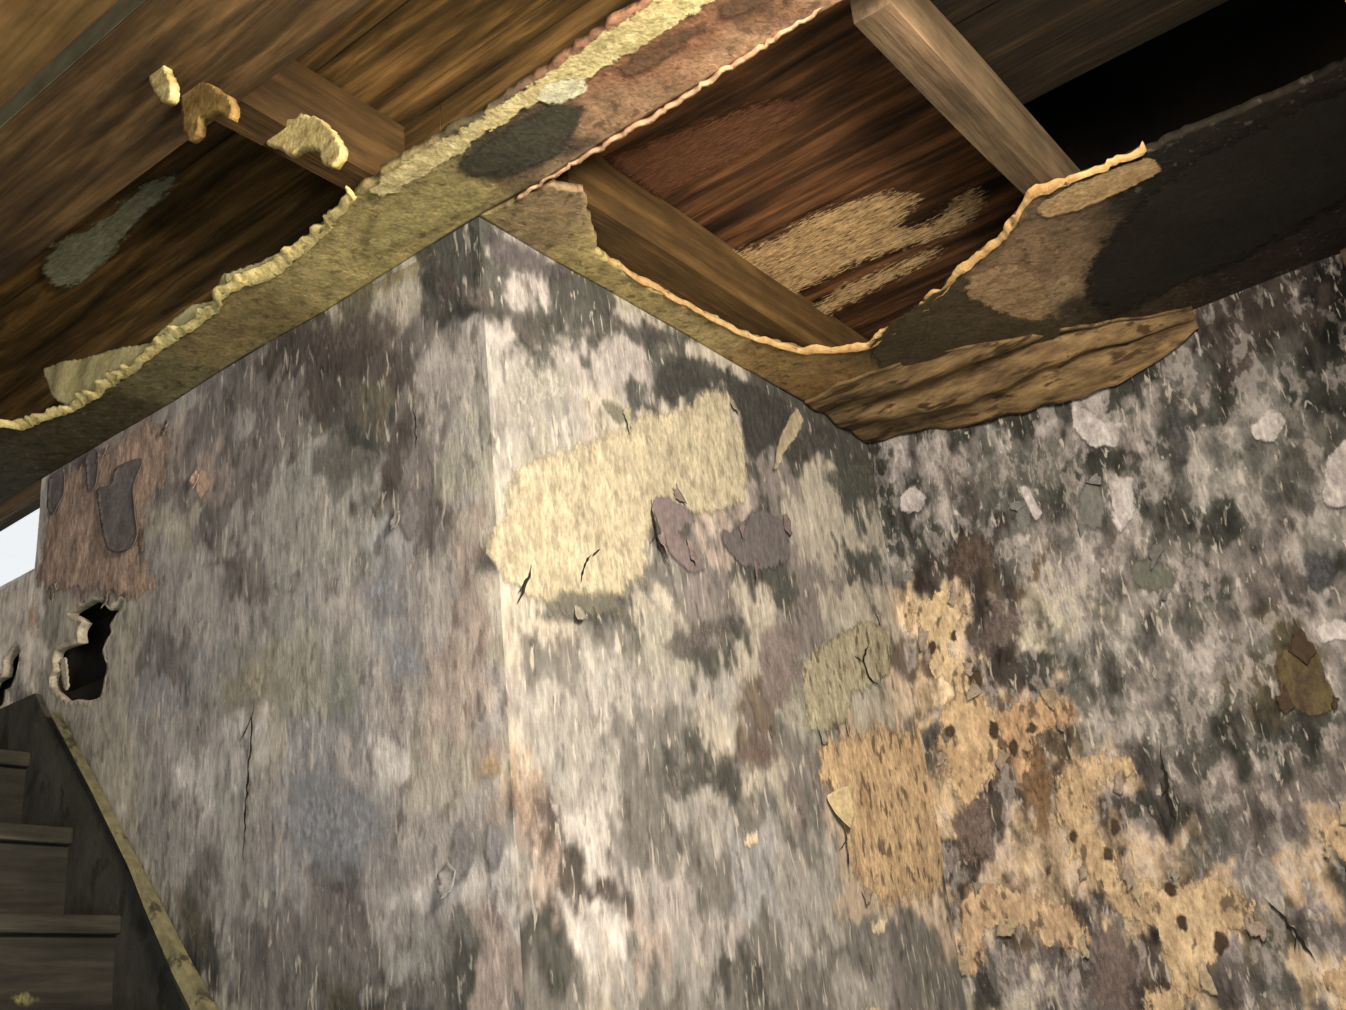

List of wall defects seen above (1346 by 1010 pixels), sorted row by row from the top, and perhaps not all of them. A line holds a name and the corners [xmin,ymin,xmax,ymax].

peeling [535,77,588,105]
peeling [1037,158,1161,217]
flaking render [486,389,793,620]
peeling [1071,400,1121,448]
peeling [1322,440,1346,508]
flaking render [36,418,169,707]
flaking render [1274,618,1346,716]
crack [240,698,254,860]
flaking render [801,580,1076,936]
flaking render [957,866,1092,977]
flaking render [1048,748,1267,1010]
crack [1264,898,1316,964]